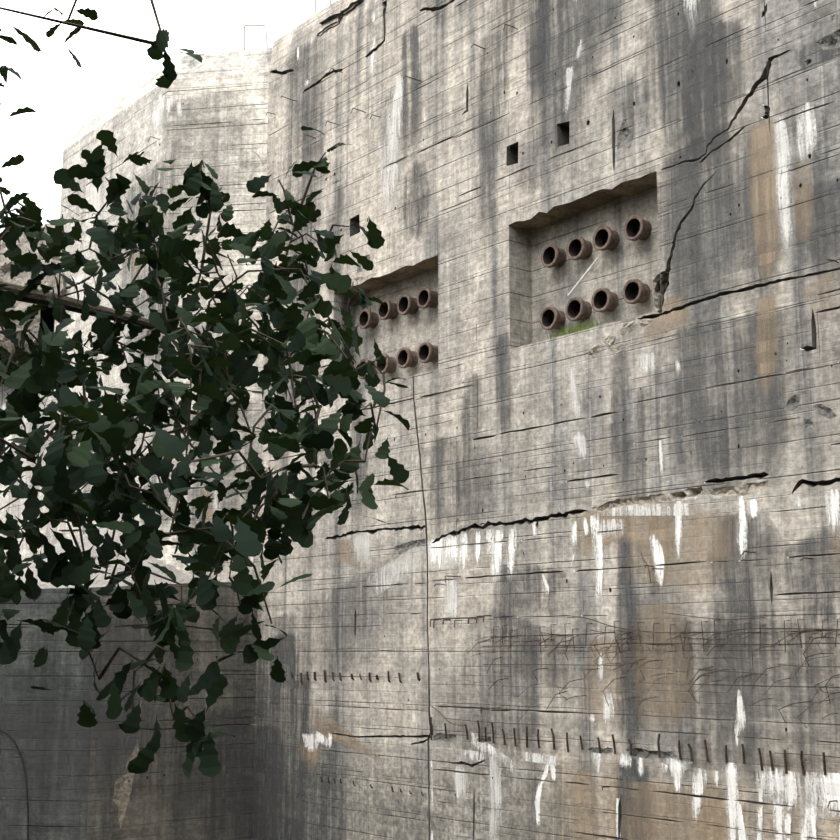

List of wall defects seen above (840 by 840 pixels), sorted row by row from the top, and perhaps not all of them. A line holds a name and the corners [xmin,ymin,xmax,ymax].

crack [316,0,387,57]
water stain [381,25,419,201]
water stain [646,0,824,303]
crack [638,50,839,319]
spalling [816,29,840,50]
crack [704,472,769,483]
crack [792,477,840,494]
crack [325,375,587,840]
water stain [571,495,702,840]
water stain [676,489,840,754]
water stain [661,732,746,840]
water stain [757,767,840,840]